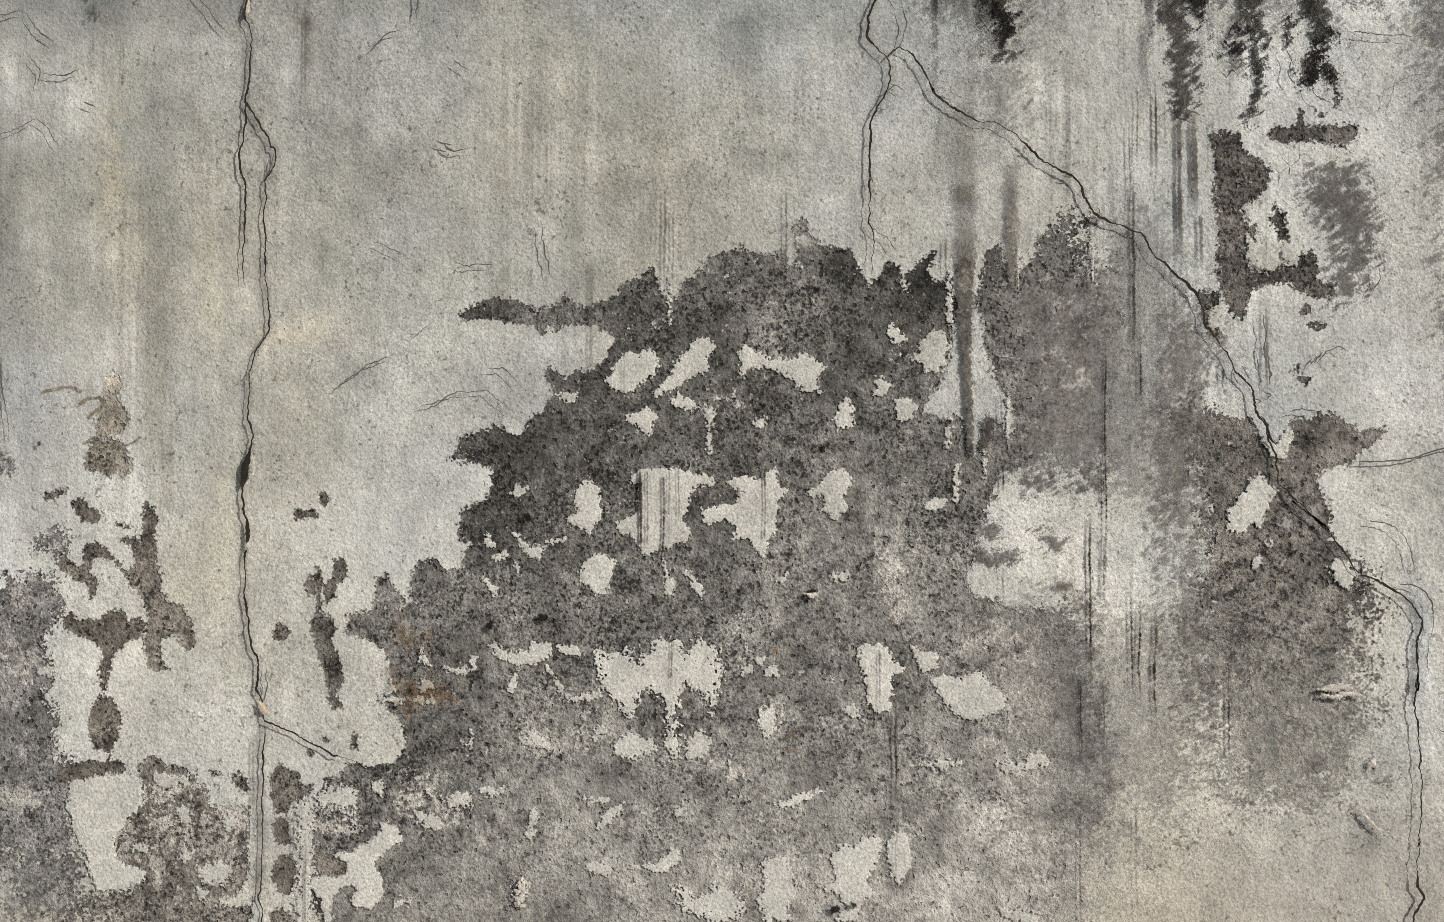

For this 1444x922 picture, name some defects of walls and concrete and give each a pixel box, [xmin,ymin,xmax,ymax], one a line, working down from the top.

crack [200,0,362,922]
crack [371,0,419,48]
crack [437,141,469,152]
flaking render [0,194,1140,922]
leakage [973,0,1024,62]
leakage [945,190,1112,660]
crack [866,0,1444,922]
leakage [1128,0,1344,393]
flaking render [1197,129,1337,339]
flaking render [1159,384,1415,840]
flaking render [1267,53,1359,149]
leakage [1295,150,1395,315]